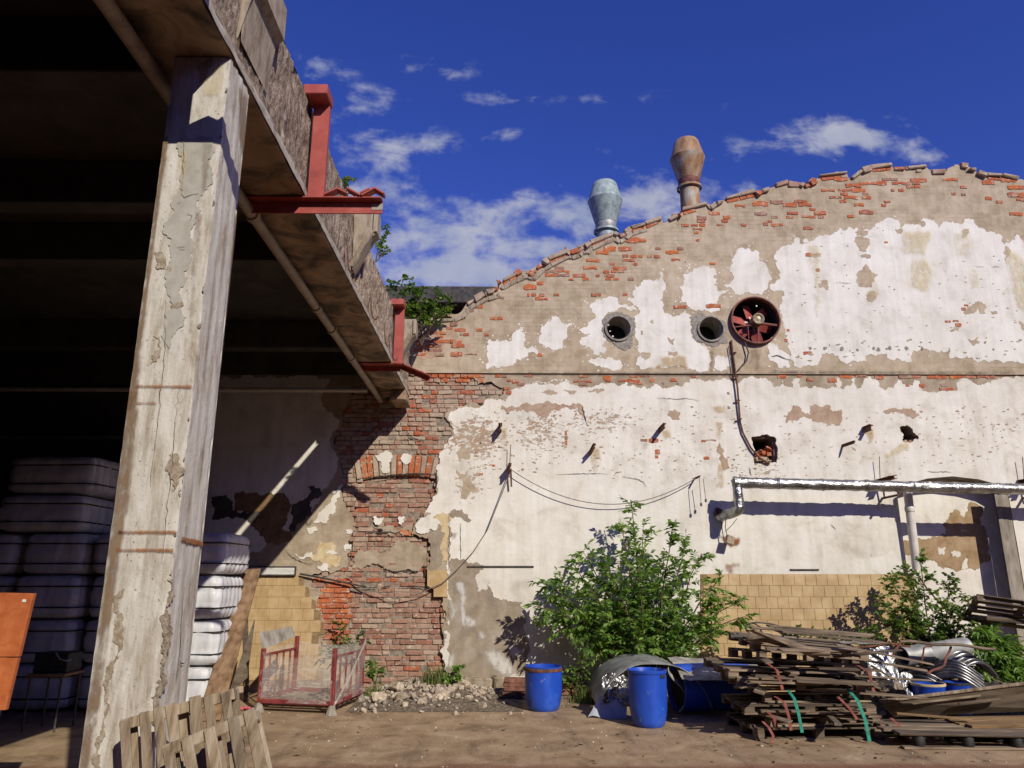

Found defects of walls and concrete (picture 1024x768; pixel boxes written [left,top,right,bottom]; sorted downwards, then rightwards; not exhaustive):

spalling [197,57,214,82]
spalling [154,252,172,271]
peeling [295,176,1024,678]
spalling [165,453,185,496]
spalling [234,491,293,546]
crack [360,523,461,593]
spalling [151,572,175,708]
spalling [91,589,124,768]